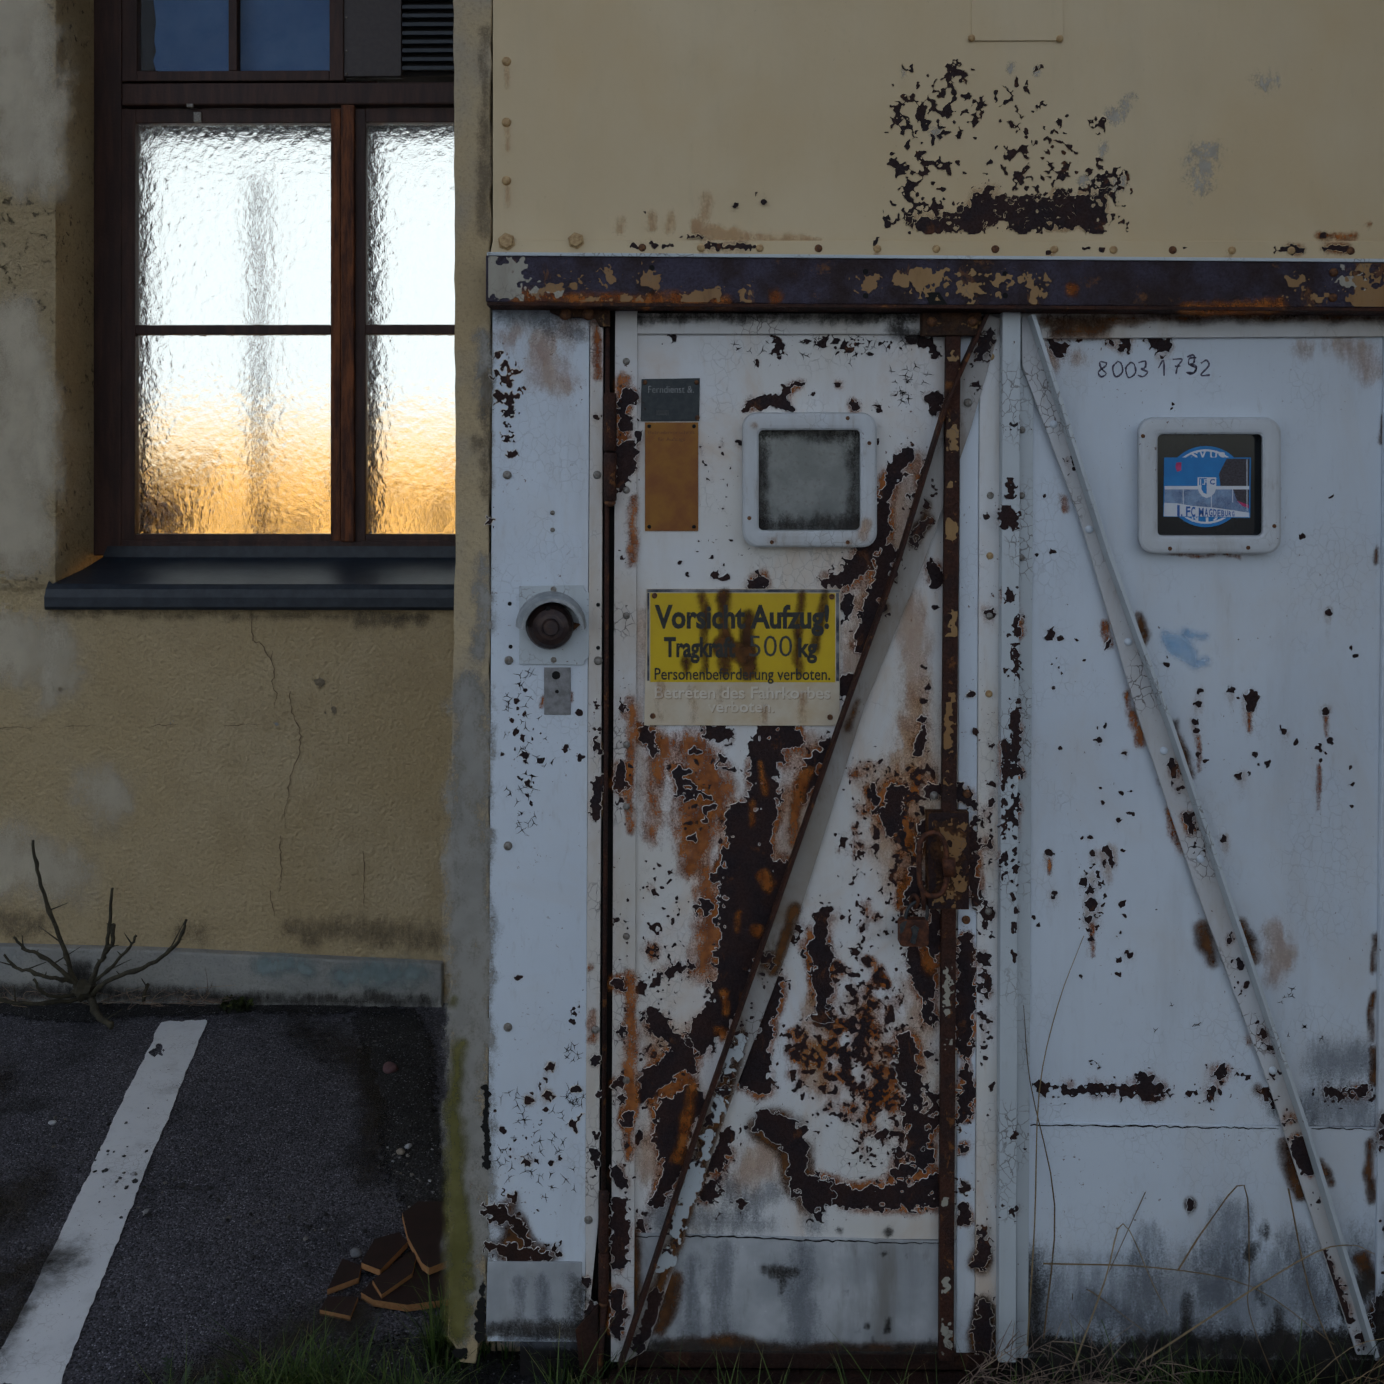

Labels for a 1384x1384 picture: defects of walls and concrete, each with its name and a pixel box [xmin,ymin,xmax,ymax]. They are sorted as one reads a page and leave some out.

peeling [872,58,1133,255]
peeling [849,265,1051,304]
rust [627,495,639,567]
crack [224,615,302,915]
rust [1124,691,1145,747]
rust [922,778,987,914]
rust [1166,808,1183,852]
water stain [0,962,431,1007]
rust [620,697,956,1352]
water stain [443,1039,587,1344]
water stain [644,1318,938,1354]
water stain [1013,1255,1384,1383]